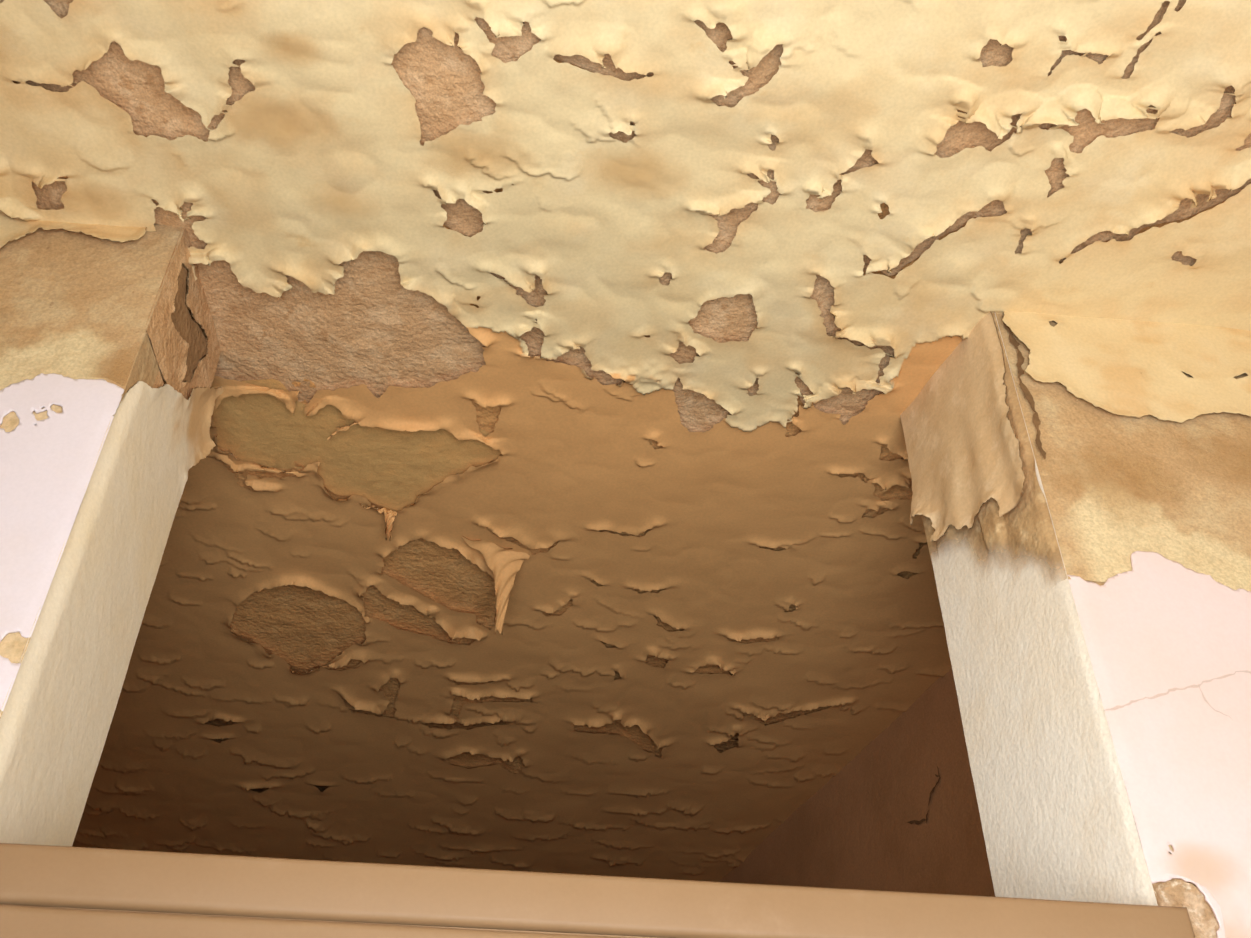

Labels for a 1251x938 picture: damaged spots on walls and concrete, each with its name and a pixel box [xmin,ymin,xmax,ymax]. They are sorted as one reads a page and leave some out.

spalling [0,23,278,141]
spalling [375,0,562,146]
spalling [667,0,813,107]
spalling [954,11,1127,67]
peeling [1202,62,1251,118]
spalling [677,118,896,254]
spalling [908,78,1211,236]
spalling [1087,161,1251,242]
spalling [797,259,910,358]
peeling [0,156,888,847]
flaking render [872,311,1251,591]
crack [907,766,941,825]